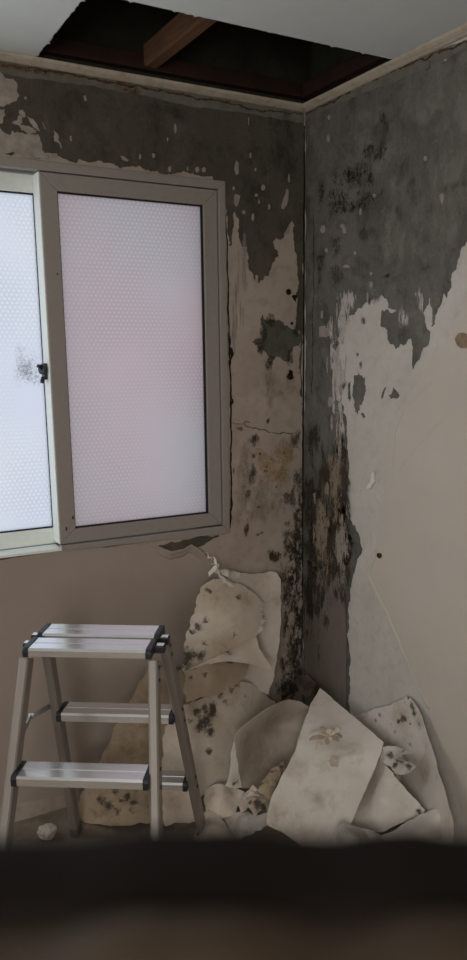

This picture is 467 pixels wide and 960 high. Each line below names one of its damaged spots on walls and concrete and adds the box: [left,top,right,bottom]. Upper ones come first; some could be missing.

damp [319,138,409,218]
damp [365,74,467,300]
crack [0,40,467,675]
peeling [0,49,467,713]
damp [247,419,354,710]